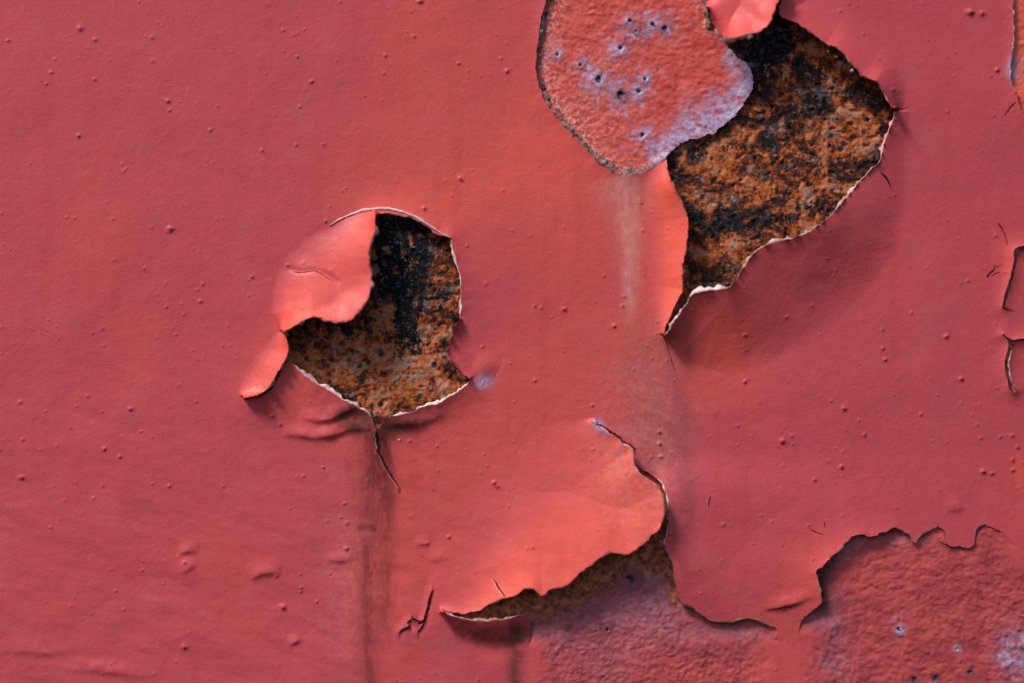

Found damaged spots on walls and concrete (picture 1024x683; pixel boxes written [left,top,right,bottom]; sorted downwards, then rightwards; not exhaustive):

peeling [529,0,911,340]
peeling [238,199,501,445]
crack [374,432,400,488]
crack [400,591,432,632]
peeling [422,414,1024,683]